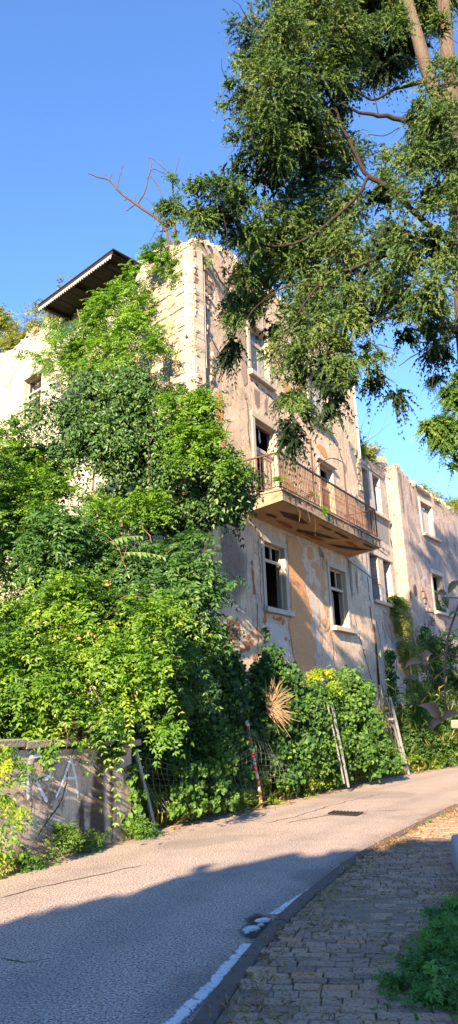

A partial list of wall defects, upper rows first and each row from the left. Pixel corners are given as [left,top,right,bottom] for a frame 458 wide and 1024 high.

peeling [229,535,331,687]
leakage [266,494,380,595]